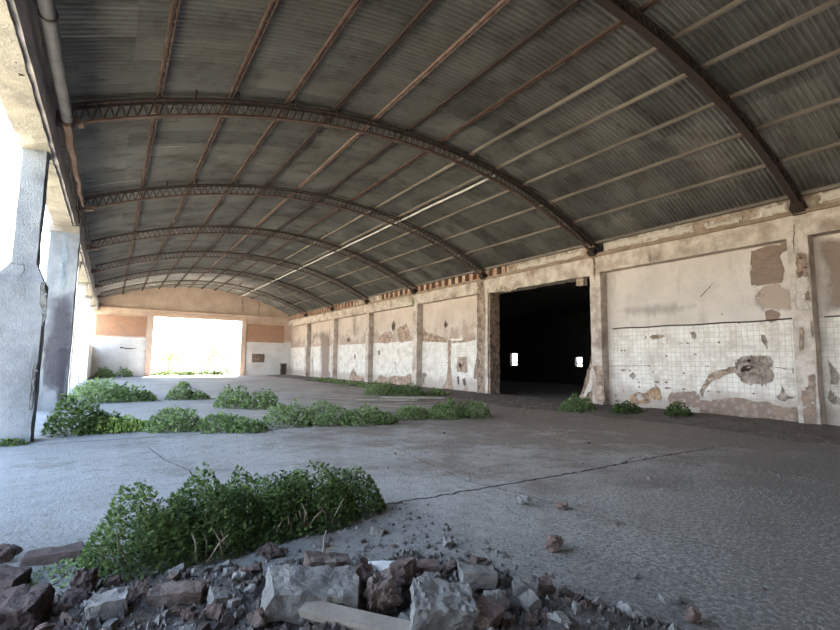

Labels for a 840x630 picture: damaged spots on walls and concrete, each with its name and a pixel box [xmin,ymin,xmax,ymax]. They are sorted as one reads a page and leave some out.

flaking render [749,242,811,324]
peeling [377,323,412,355]
flaking render [422,280,524,393]
peeling [349,354,364,381]
peeling [376,373,412,386]
flaking render [592,365,605,402]
peeling [615,335,817,424]
peeling [827,361,840,405]
crack [385,443,765,561]